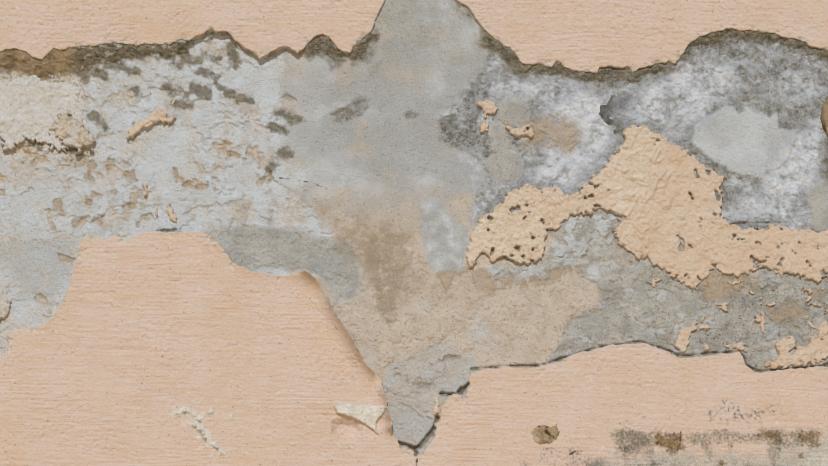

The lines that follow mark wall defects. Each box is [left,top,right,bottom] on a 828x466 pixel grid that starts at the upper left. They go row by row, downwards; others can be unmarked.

leakage [620,55,746,132]
leakage [778,54,827,109]
leakage [476,76,616,191]
spalling [0,0,828,358]
leakage [737,123,826,225]
leakage [703,272,748,300]
spalling [310,205,828,456]
spalling [169,406,235,456]
leakage [616,432,657,452]